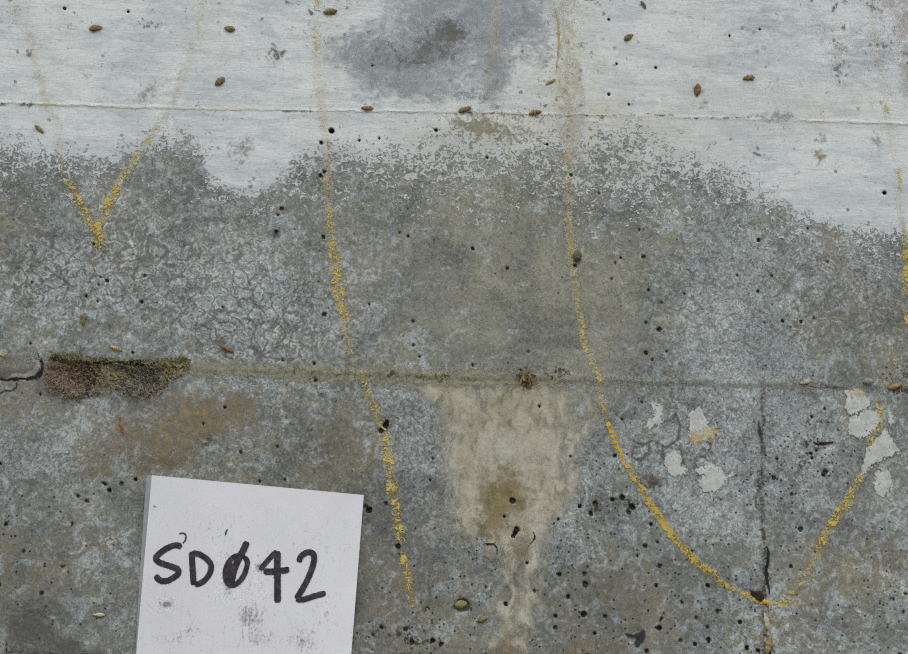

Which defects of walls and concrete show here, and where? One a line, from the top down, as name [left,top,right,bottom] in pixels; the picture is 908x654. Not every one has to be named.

water stain [0,0,543,142]
crack [0,353,44,393]
water stain [187,360,672,653]
peeling [644,401,663,430]
peeling [664,450,734,492]
peeling [688,407,718,444]
crack [755,383,773,654]
peeling [844,389,900,498]